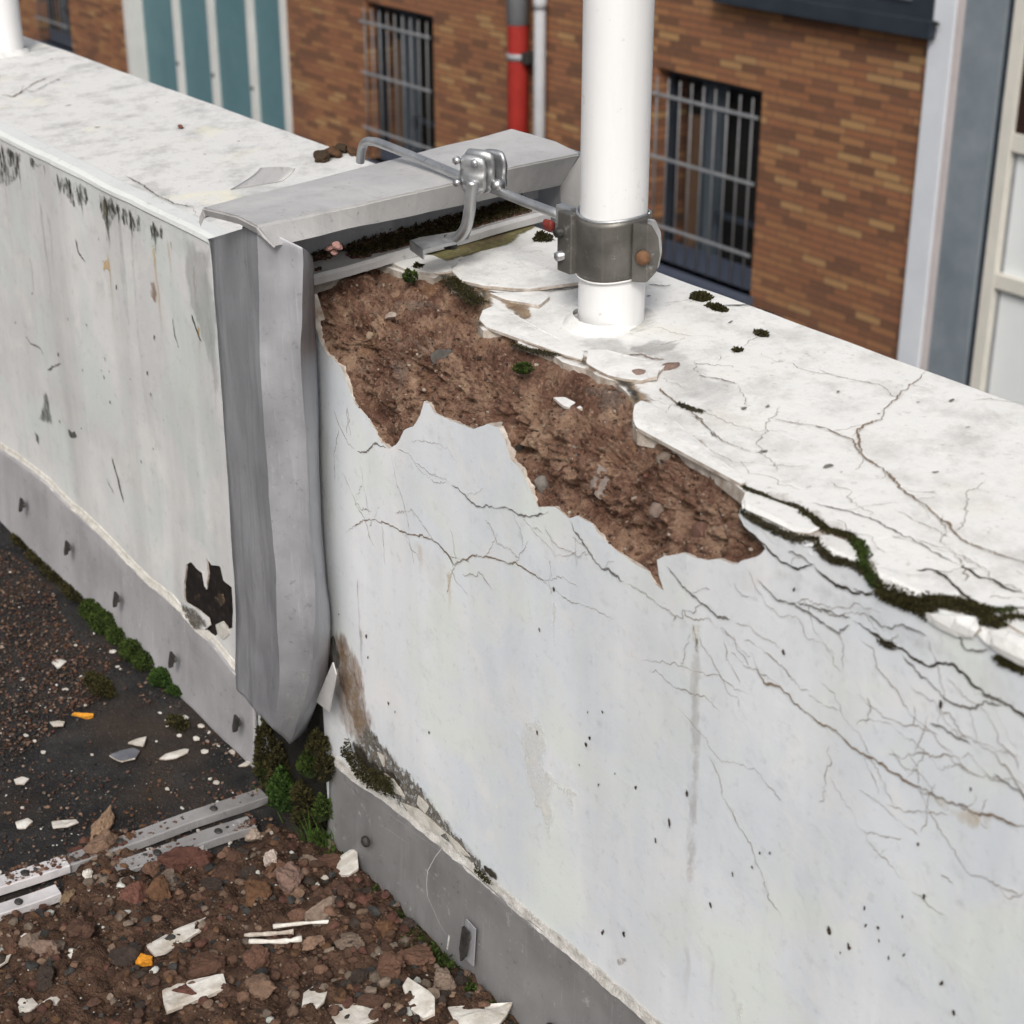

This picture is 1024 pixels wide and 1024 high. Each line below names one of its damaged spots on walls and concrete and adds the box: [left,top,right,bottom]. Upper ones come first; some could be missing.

leakage [0,146,33,183]
leakage [57,176,162,242]
spalling [319,240,859,588]
crack [654,357,1024,609]
peeling [181,561,233,640]
crack [334,412,1024,899]
spalling [874,564,960,599]
spalling [924,612,1024,667]